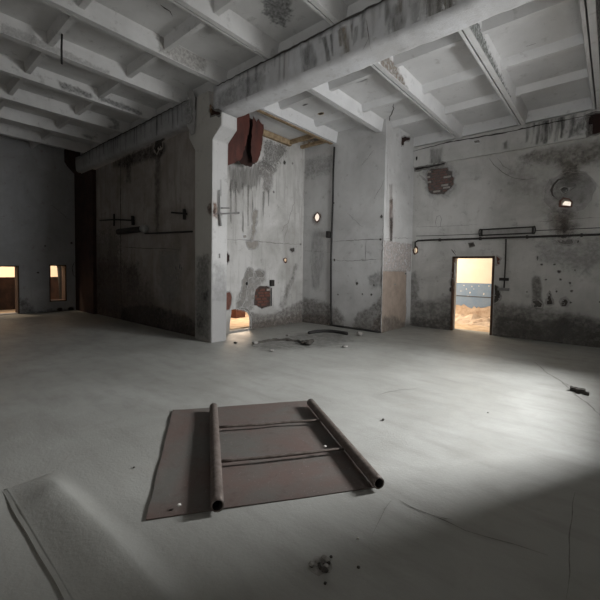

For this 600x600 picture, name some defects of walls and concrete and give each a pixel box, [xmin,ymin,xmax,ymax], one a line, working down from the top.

leakage [229,140,286,205]
flaking render [414,156,455,195]
flaking render [226,267,271,329]
leakage [239,271,343,330]
leakage [355,300,451,331]
leakage [494,279,600,347]